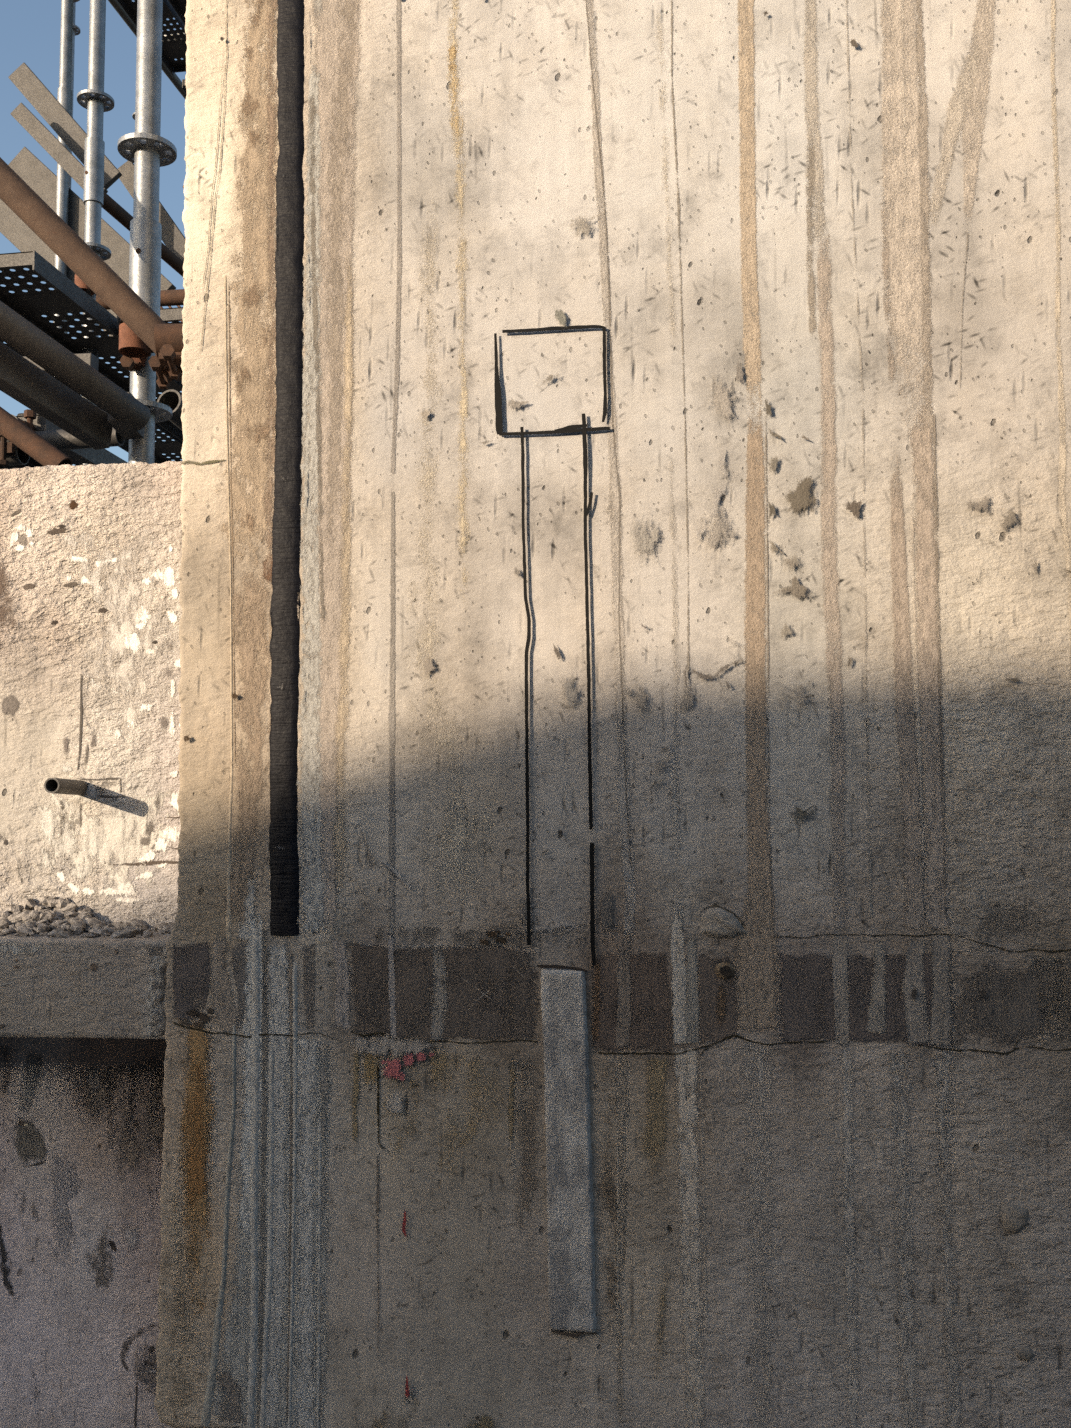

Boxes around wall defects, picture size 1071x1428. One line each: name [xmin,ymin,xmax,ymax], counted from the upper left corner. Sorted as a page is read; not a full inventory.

crack [537,964,587,972]
leakage [0,1046,44,1112]
crack [599,1035,830,1056]
crack [915,1039,1071,1055]
leakage [62,1060,165,1200]
leakage [16,1119,139,1293]
corrosion [162,1024,217,1410]